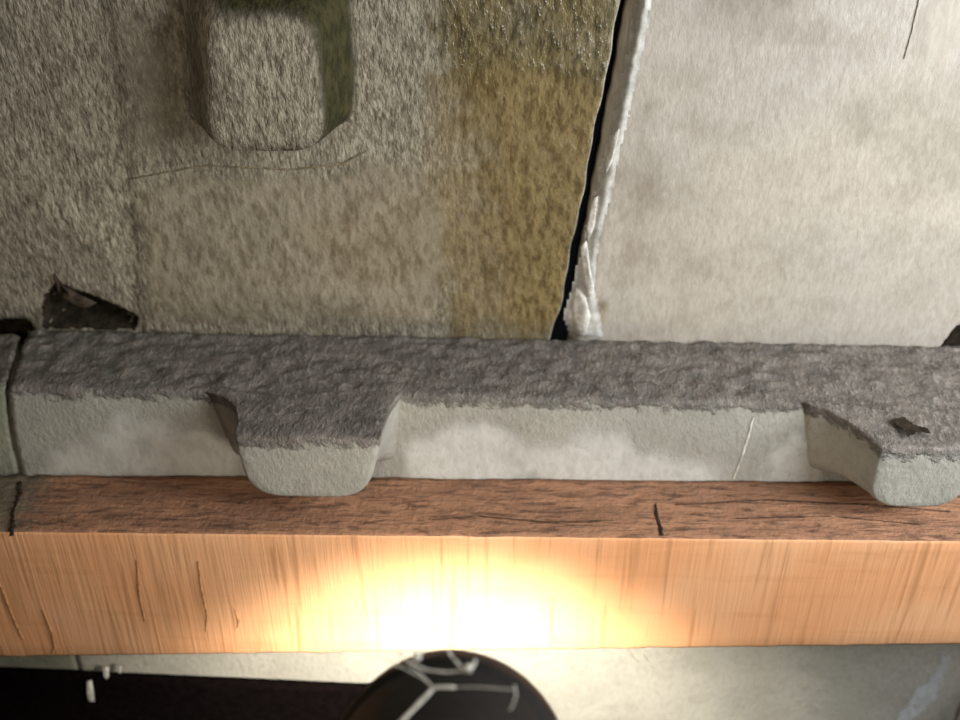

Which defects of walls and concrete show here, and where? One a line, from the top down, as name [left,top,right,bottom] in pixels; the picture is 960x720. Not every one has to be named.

damp [433,0,617,324]
spalling [0,274,139,346]
spalling [892,417,930,437]
crack [8,481,23,537]
crack [952,703,960,720]